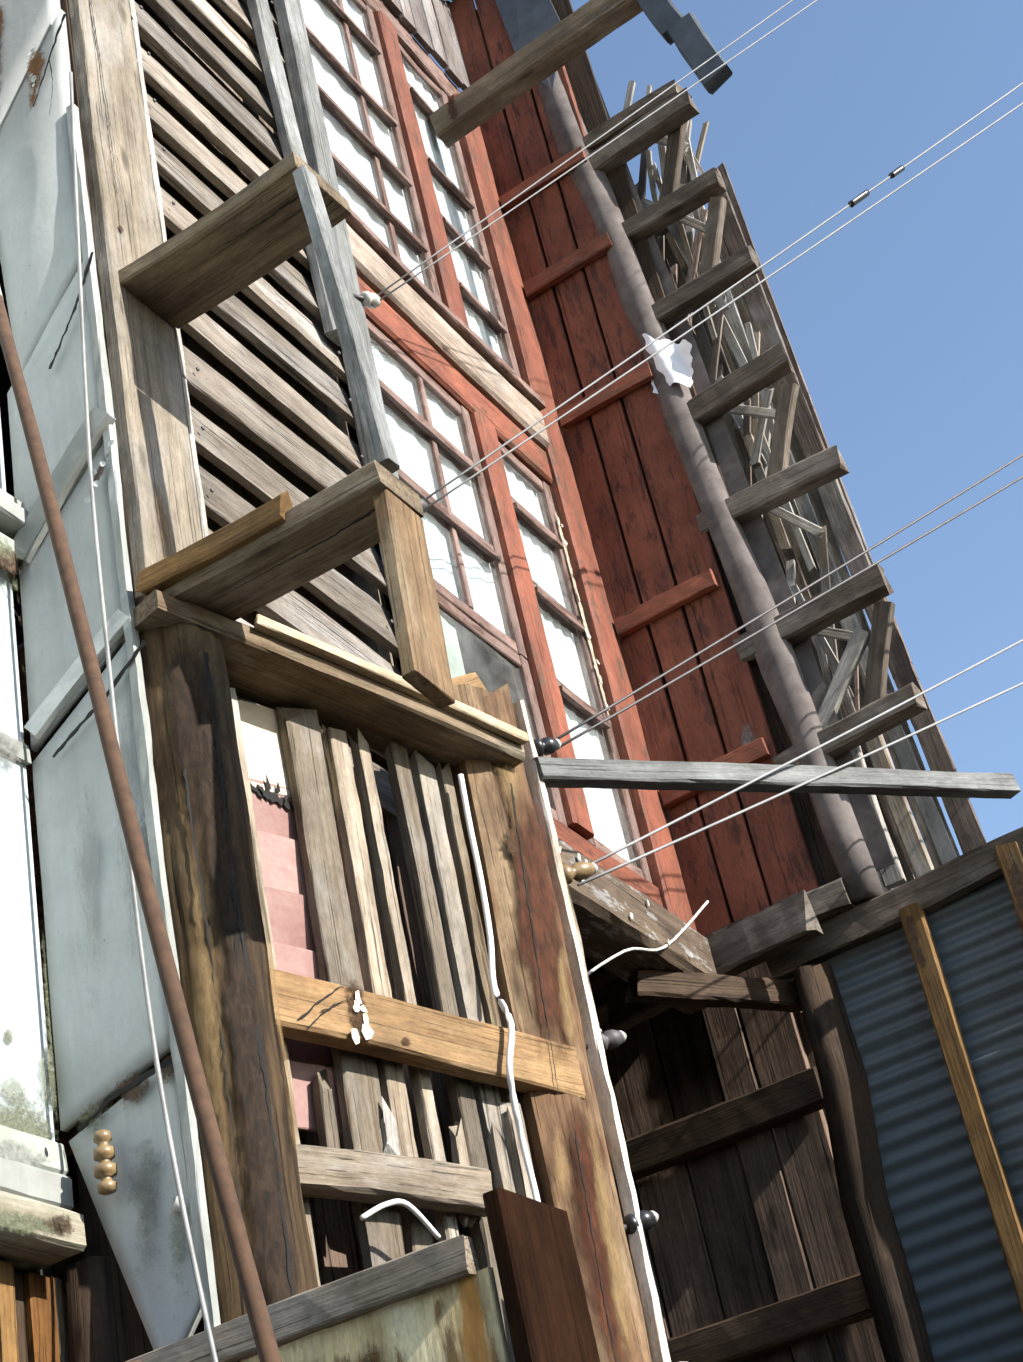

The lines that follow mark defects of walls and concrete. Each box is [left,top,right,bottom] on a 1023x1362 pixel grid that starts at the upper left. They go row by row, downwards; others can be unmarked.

corrosion [27,47,45,108]
damp [0,939,60,1139]
corrosion [443,1275,499,1362]